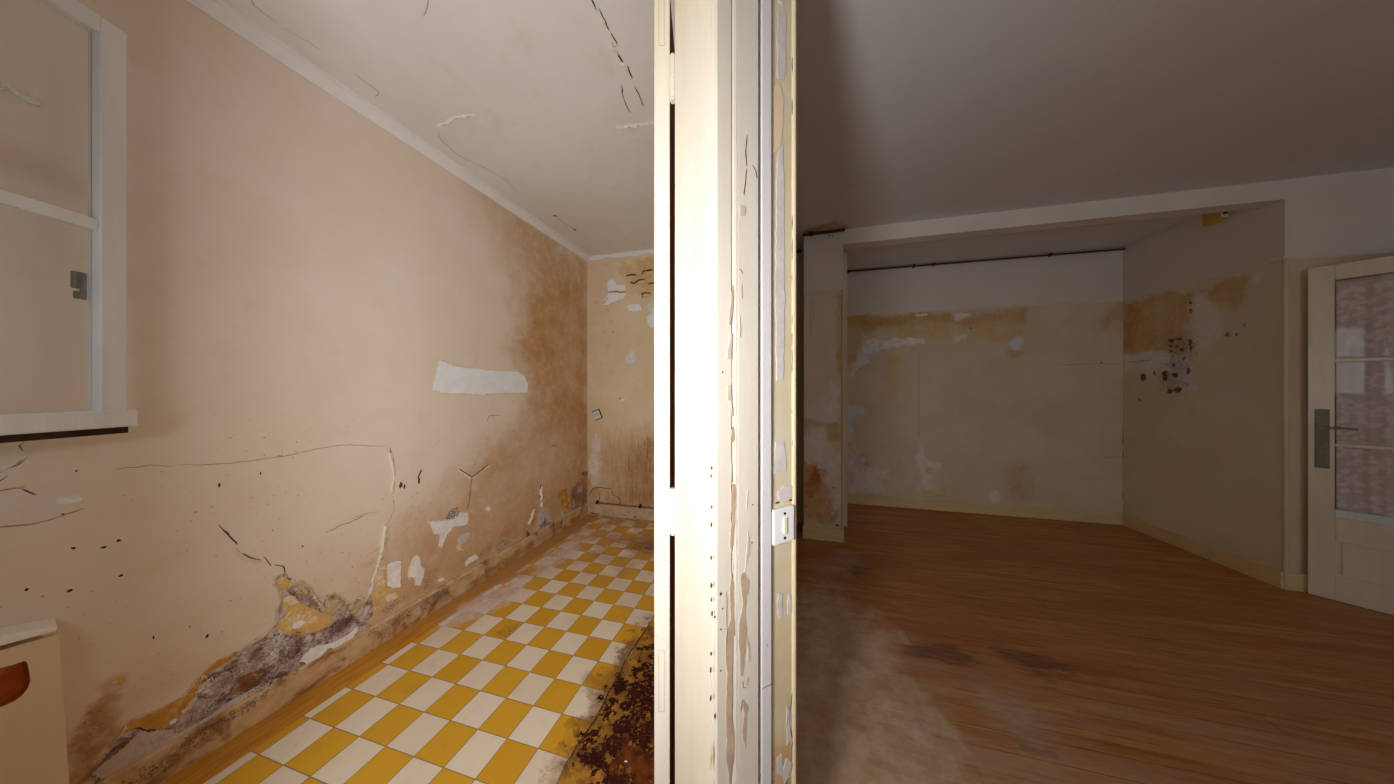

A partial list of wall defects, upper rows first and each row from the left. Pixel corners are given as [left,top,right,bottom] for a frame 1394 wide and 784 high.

crack [592,0,654,129]
flaking render [602,279,654,328]
crack [0,475,84,528]
crack [120,444,397,595]
flaking render [431,359,529,396]
damp [315,161,654,641]
peeling [428,485,570,566]
damp [796,291,1036,588]
flaking render [92,554,445,783]